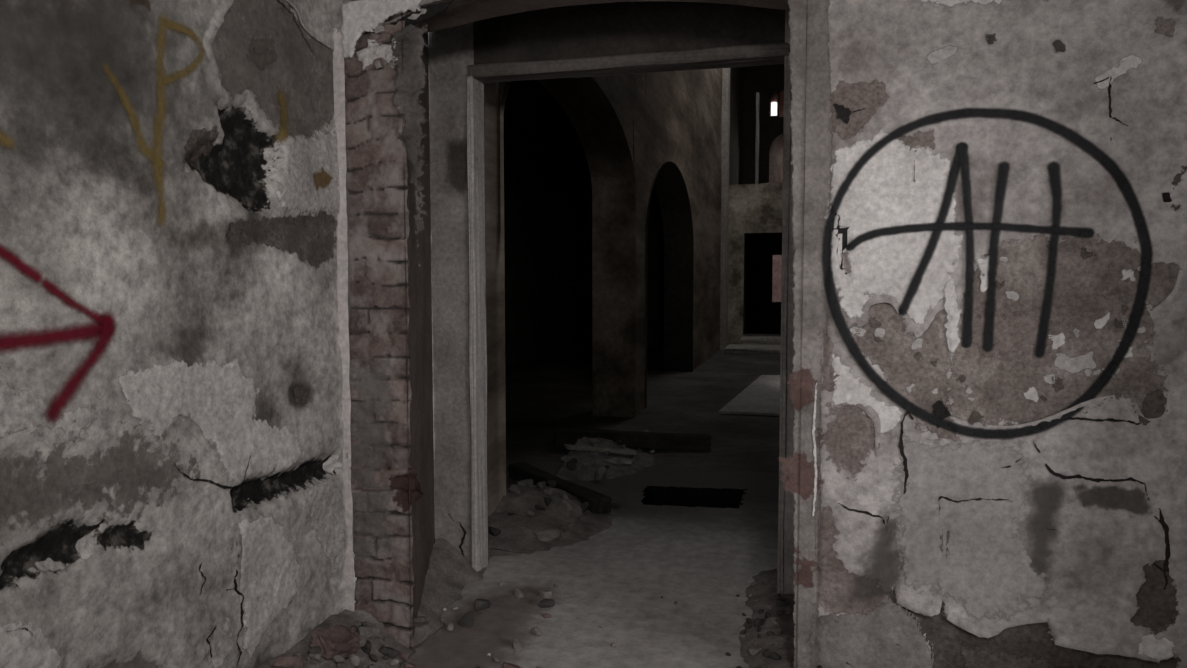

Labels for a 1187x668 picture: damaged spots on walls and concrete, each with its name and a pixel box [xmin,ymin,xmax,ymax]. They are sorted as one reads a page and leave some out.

flaking render [372,0,453,34]
flaking render [185,0,337,269]
flaking render [778,0,1187,668]
crack [1067,412,1142,425]
flaking render [0,415,343,608]
spalling [388,467,423,513]
crack [838,411,914,532]
crack [938,496,1013,515]
water stain [1030,483,1062,578]
crack [1033,441,1171,590]
water stain [1077,486,1149,514]